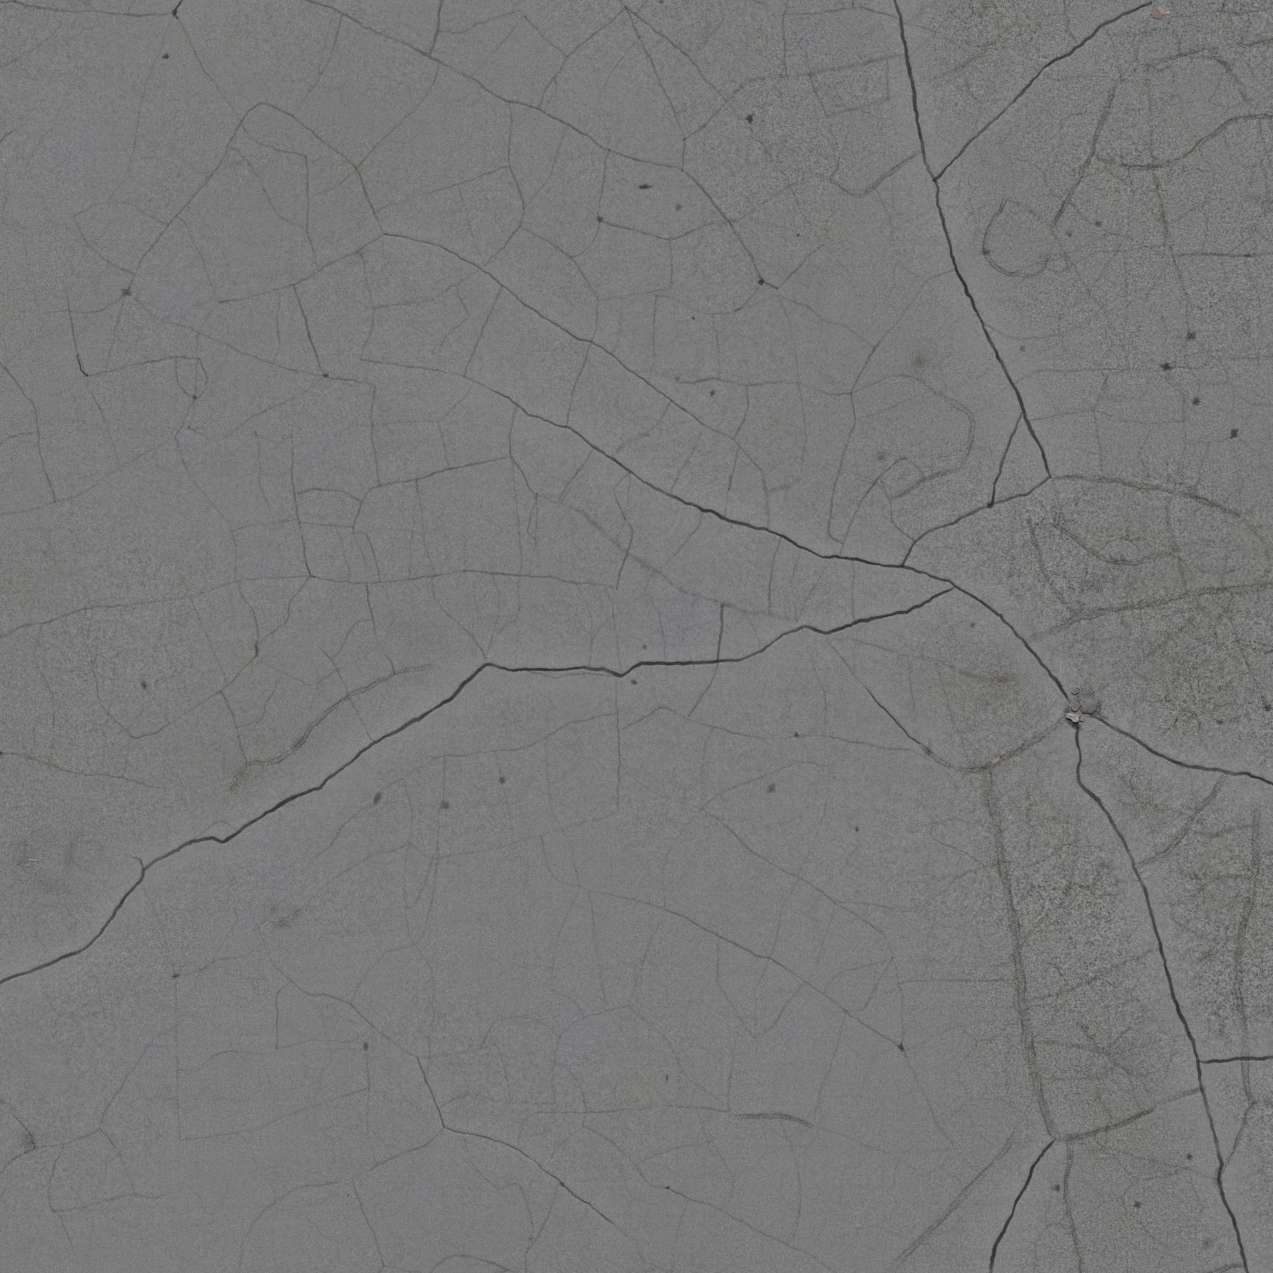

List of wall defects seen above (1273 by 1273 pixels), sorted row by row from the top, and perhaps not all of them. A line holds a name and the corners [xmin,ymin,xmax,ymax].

crack [1014,2,1152,100]
crack [894,0,1049,504]
crack [675,496,1068,698]
crack [189,646,767,844]
crack [1075,717,1127,847]
crack [1137,741,1273,785]
crack [50,882,140,964]
crack [1144,888,1268,1091]
crack [990,1141,1053,1268]
crack [1213,1130,1249,1273]